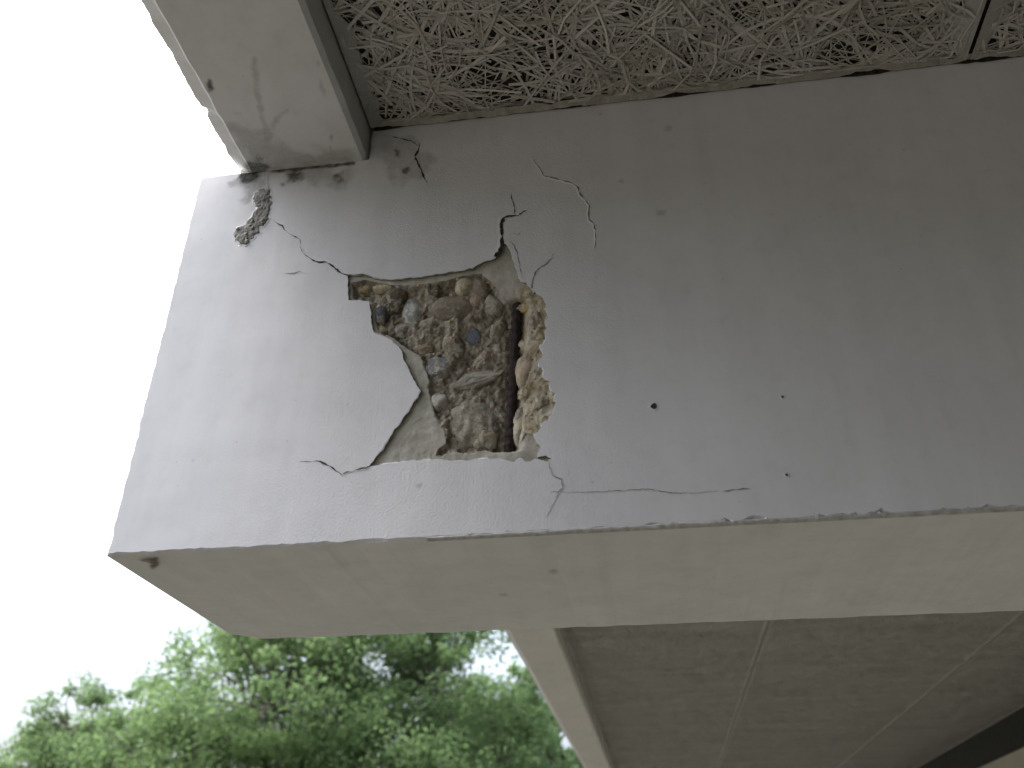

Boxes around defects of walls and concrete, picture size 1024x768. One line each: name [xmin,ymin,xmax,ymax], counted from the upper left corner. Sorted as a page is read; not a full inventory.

crack [383,135,427,182]
peeling [232,187,275,247]
crack [273,220,349,276]
crack [492,193,554,288]
crack [530,158,596,248]
spalling [348,245,557,466]
crack [299,460,369,476]
crack [546,460,751,517]